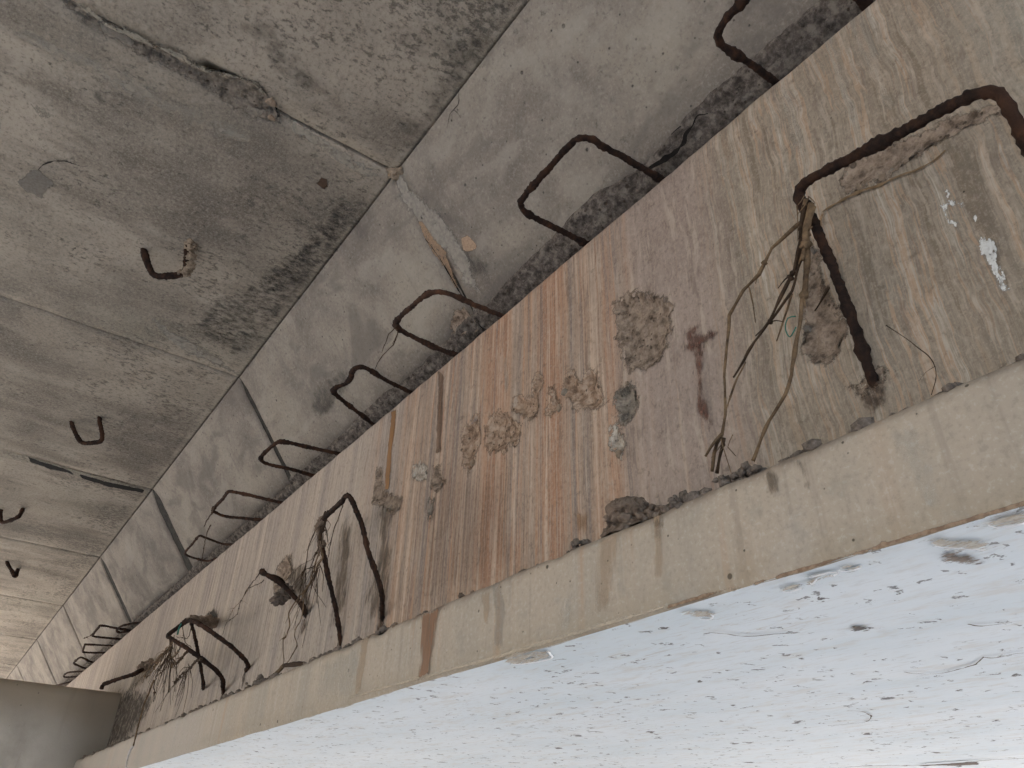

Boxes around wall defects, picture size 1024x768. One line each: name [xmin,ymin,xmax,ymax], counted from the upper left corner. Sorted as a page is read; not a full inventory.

spalling [460,288,674,473]
corrosion [684,327,717,422]
spalling [99,668,144,690]
spalling [166,618,251,695]
spalling [259,556,306,618]
spalling [320,547,342,646]
spalling [320,492,385,622]
corrosion [418,608,439,679]